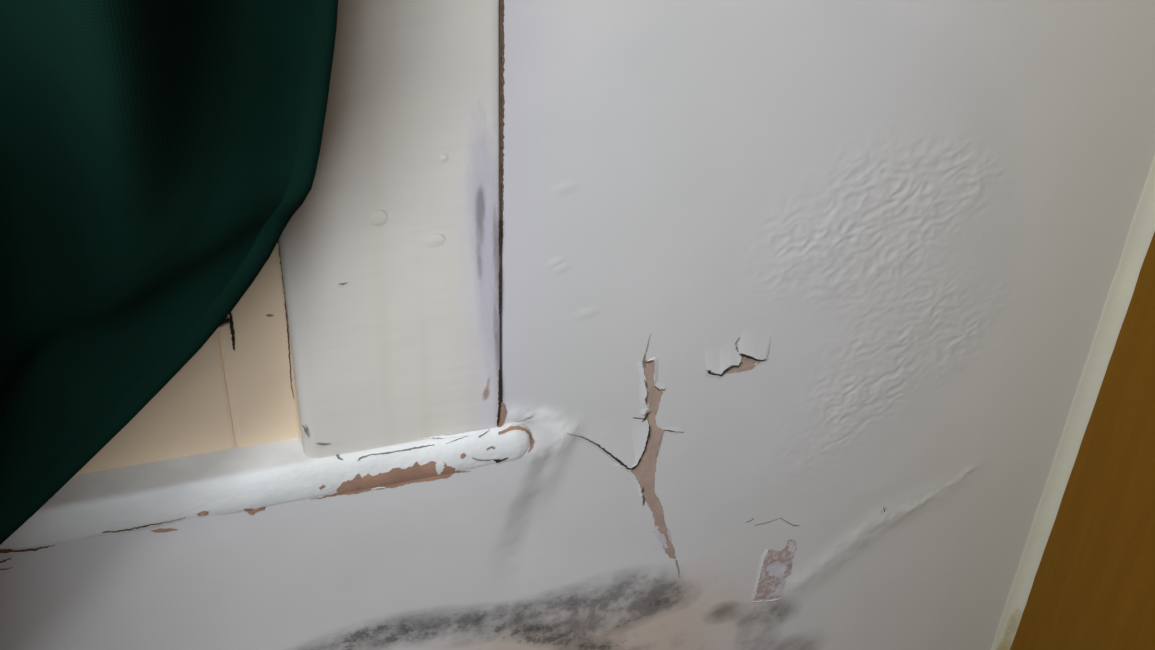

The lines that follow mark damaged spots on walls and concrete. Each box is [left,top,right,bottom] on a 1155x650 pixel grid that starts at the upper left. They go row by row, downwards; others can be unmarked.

peeling [705,327,772,374]
peeling [310,453,469,500]
spalling [751,539,797,602]
leakage [344,626,408,642]